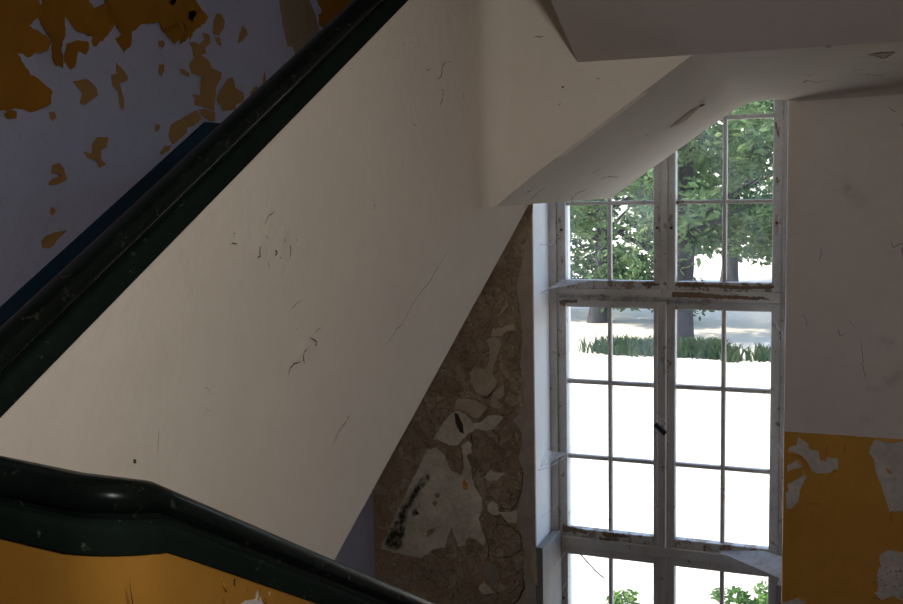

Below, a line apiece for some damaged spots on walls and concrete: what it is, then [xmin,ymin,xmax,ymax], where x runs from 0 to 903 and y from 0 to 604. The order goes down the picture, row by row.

flaking render [279,0,353,54]
peeling [0,0,266,155]
peeling [49,163,67,185]
peeling [84,137,109,168]
peeling [41,230,67,248]
flaking render [373,204,533,604]
peeling [785,437,838,510]
peeling [869,438,903,512]
peeling [242,586,271,604]
peeling [873,550,903,602]